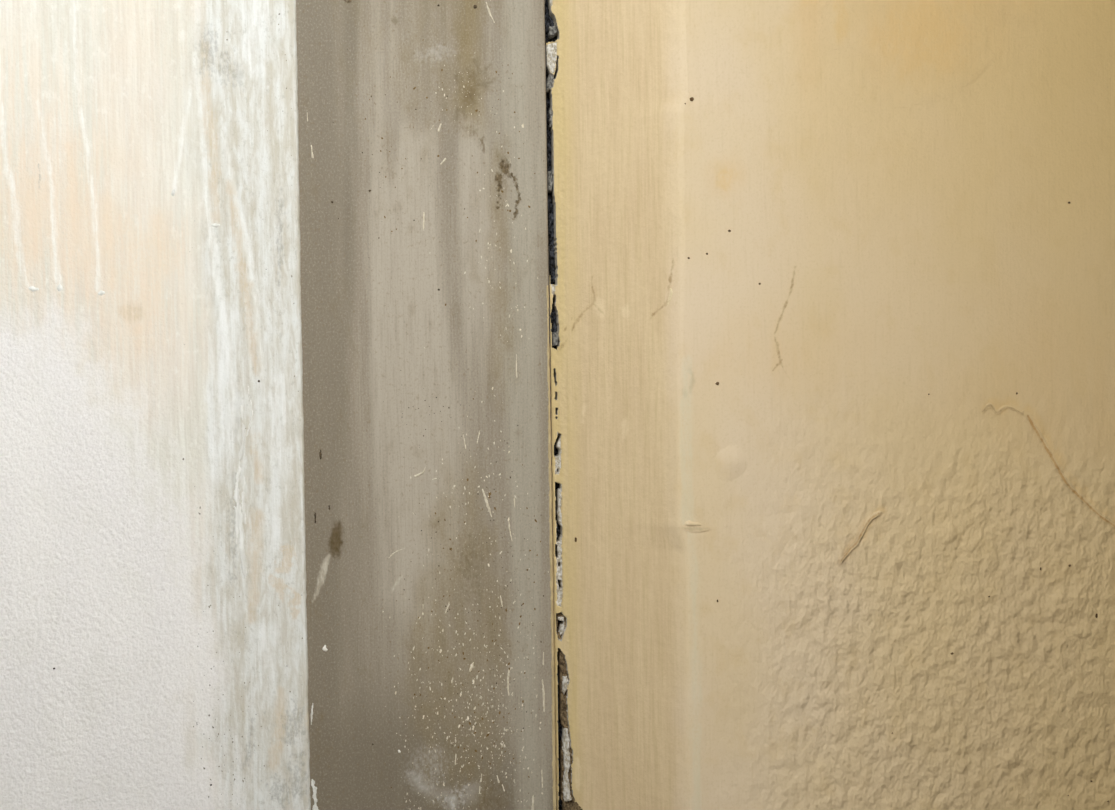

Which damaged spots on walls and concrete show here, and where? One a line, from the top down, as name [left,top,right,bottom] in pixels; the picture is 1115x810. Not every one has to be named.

damp [0,0,264,391]
damp [272,185,289,288]
crack [771,265,797,374]